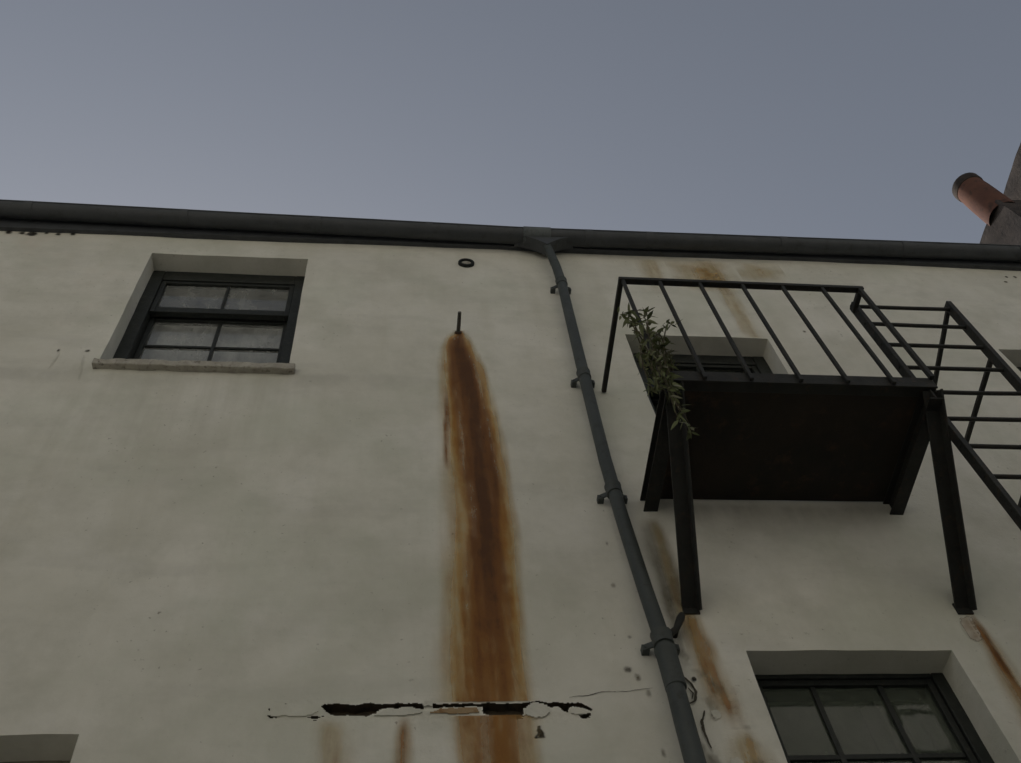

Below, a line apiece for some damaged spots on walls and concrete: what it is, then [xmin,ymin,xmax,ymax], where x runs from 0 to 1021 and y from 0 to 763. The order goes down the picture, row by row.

corrosion [443,331,528,702]
corrosion [688,617,733,713]
corrosion [974,623,1021,705]
crack [257,688,648,728]
corrosion [458,715,525,763]